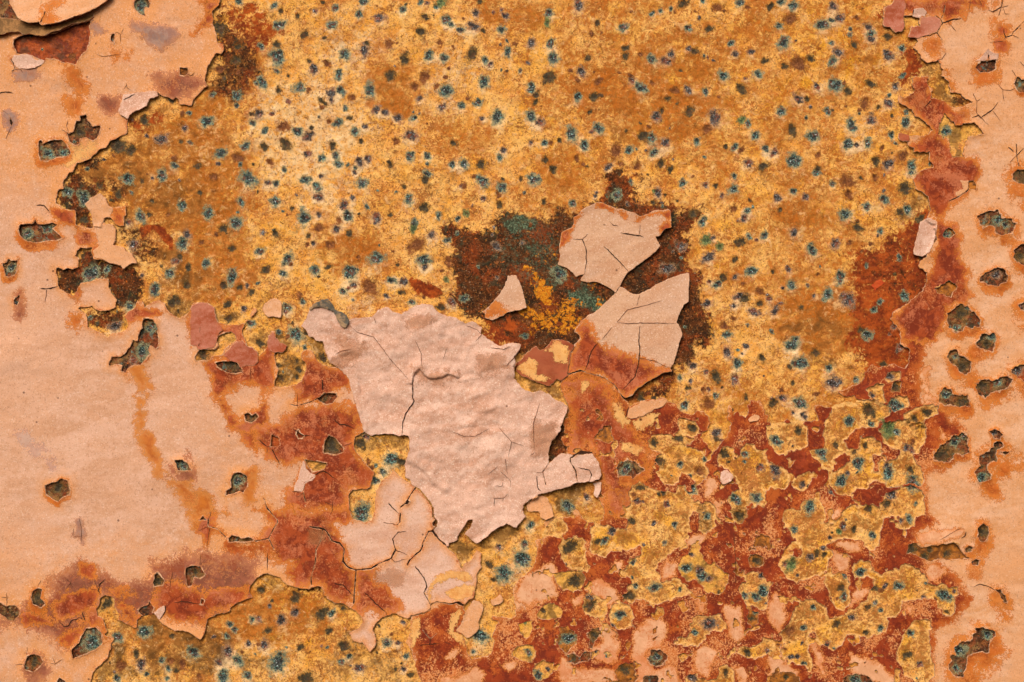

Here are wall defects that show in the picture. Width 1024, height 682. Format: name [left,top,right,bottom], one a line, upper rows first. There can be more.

corrosion [58,61,122,118]
corrosion [0,206,103,324]
corrosion [309,299,349,328]
crack [336,319,446,431]
peeling [0,0,815,682]
crack [578,221,643,274]
crack [568,295,673,417]
corrosion [409,0,1024,682]
peeling [718,0,1024,682]
corrosion [0,323,406,682]
crack [292,471,464,615]
crack [570,451,592,481]